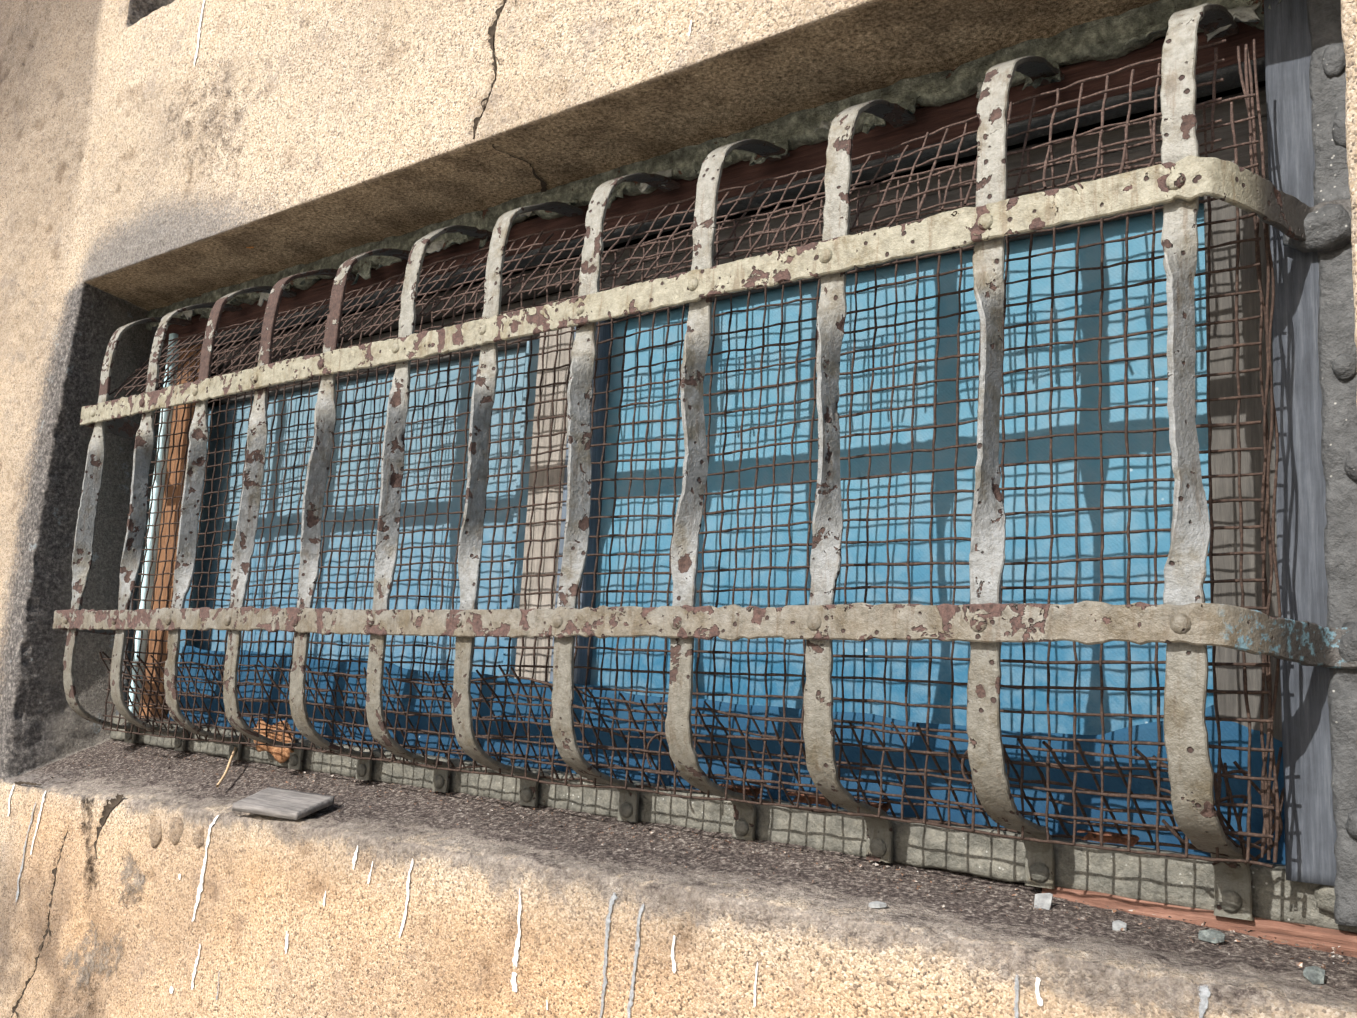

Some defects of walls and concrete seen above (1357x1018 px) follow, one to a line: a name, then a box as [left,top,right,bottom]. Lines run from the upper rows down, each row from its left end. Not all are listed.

crack [473,0,547,193]
water stain [15,791,46,905]
crack [11,794,124,1018]
water stain [82,797,96,900]
water stain [192,815,218,921]
water stain [399,858,413,938]
water stain [511,889,522,992]
water stain [600,892,617,1018]
water stain [627,904,644,1018]
water stain [1035,977,1043,1006]
water stain [1199,985,1210,1018]